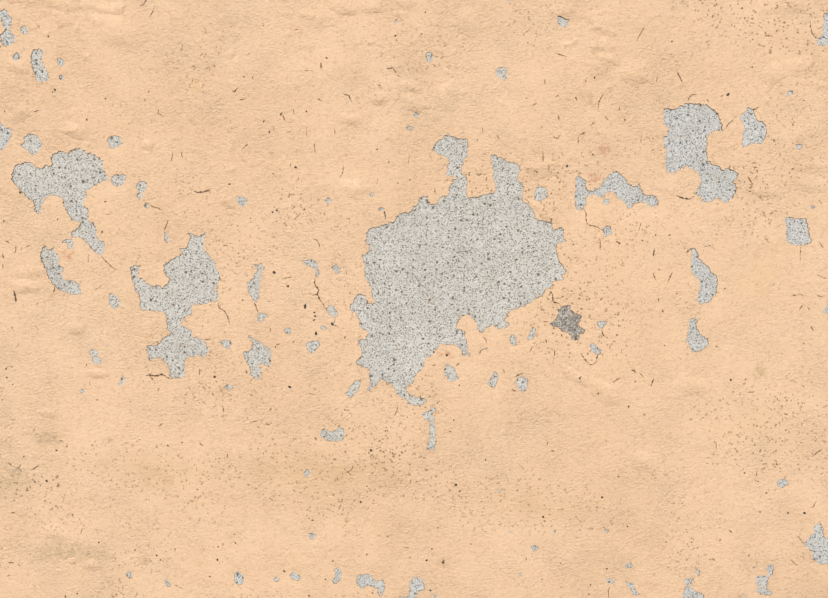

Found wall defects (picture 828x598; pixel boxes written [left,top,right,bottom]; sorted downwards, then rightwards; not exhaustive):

peeling [0,0,28,47]
peeling [740,107,767,147]
peeling [663,103,738,202]
peeling [12,134,126,255]
peeling [574,171,658,210]
peeling [40,245,81,295]
peeling [131,232,220,378]
peeling [345,134,566,450]
peeling [550,305,585,341]
peeling [691,248,717,304]
peeling [243,335,272,379]
peeling [804,523,828,564]